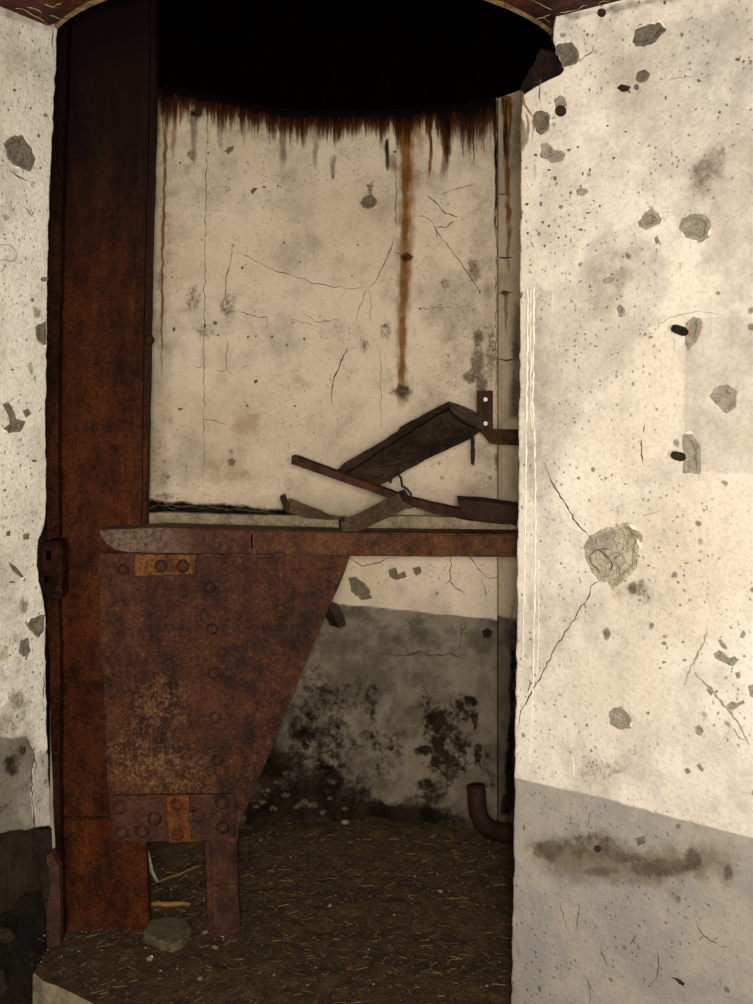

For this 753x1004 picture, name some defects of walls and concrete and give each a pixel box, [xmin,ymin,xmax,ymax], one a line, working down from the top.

spalling [555,42,579,68]
spalling [4,134,41,171]
crack [149,113,409,515]
rust [158,81,539,399]
crack [423,110,515,417]
spalling [679,214,712,243]
spalling [709,384,738,413]
crack [517,463,631,728]
spalling [583,523,643,590]
leakage [243,649,516,828]